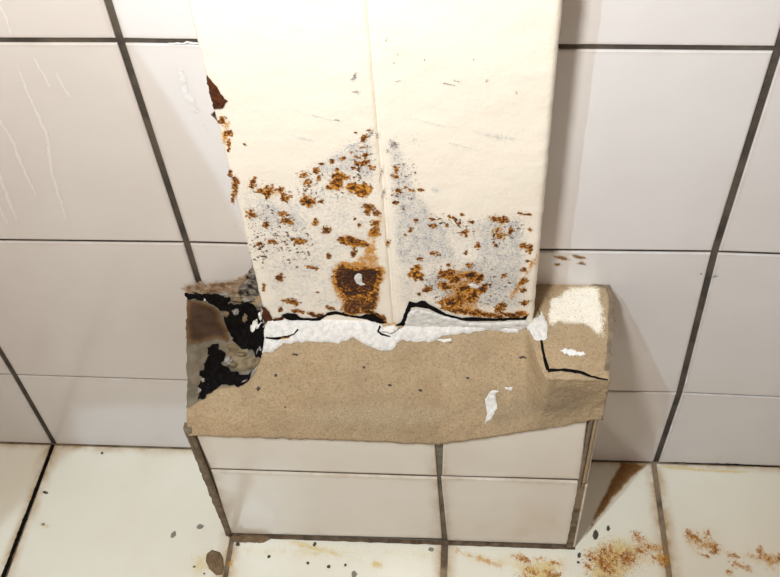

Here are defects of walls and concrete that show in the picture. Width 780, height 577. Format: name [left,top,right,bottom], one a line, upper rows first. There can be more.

rust [207,76,233,152]
spalling [182,131,533,408]
rust [227,128,540,340]
crack [526,307,608,380]
rust [449,462,670,577]
rust [681,528,780,575]